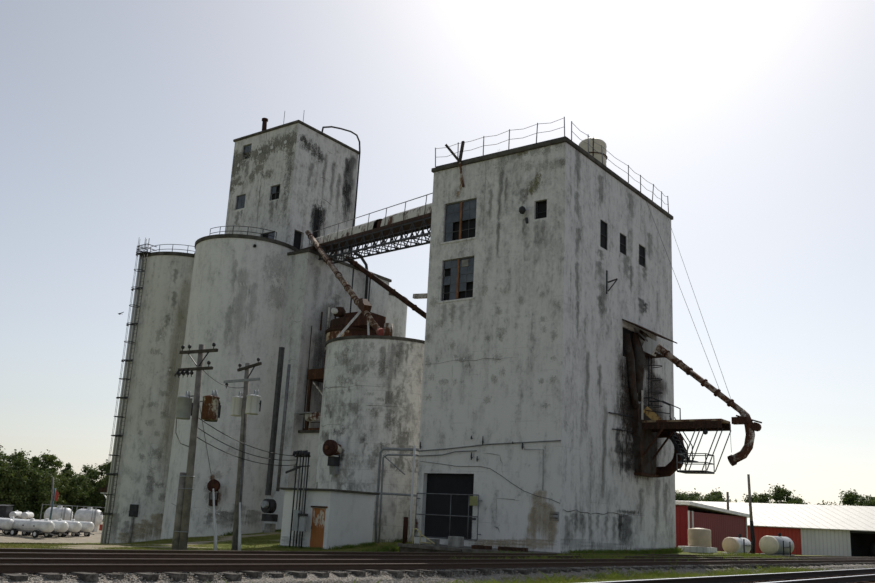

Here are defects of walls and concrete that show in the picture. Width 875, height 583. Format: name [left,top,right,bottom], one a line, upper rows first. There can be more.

leakage [343,158,355,211]
leakage [311,204,326,236]
leakage [616,359,638,476]
leakage [643,351,664,420]